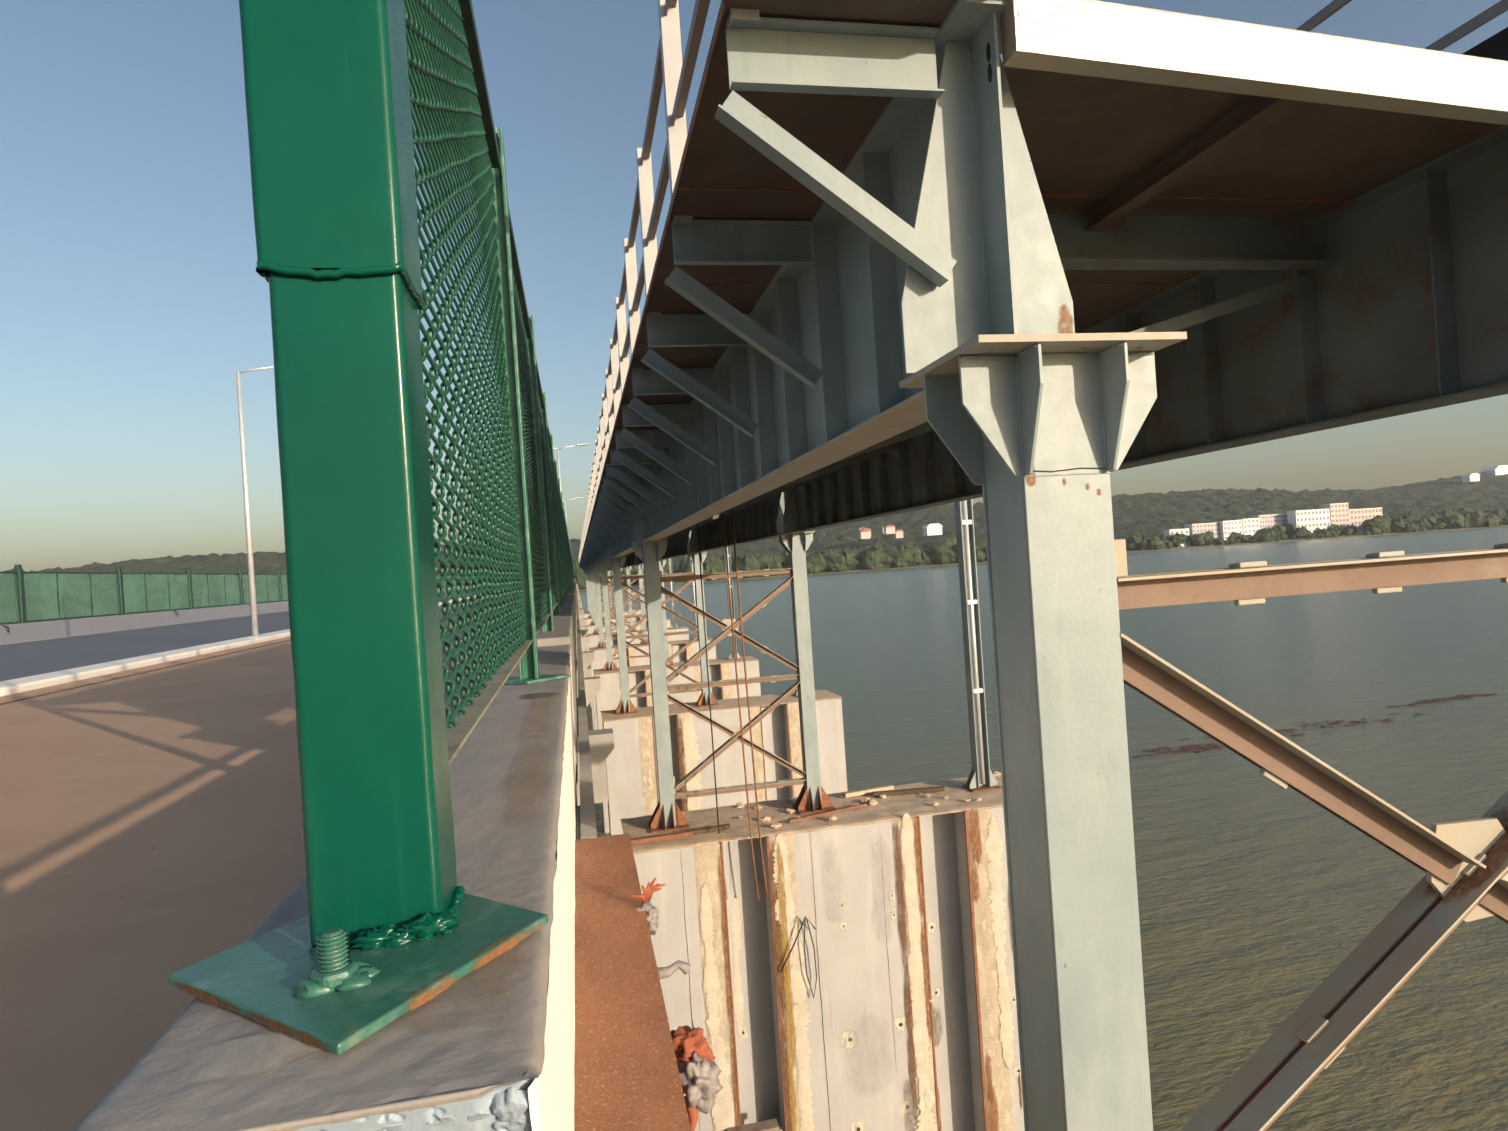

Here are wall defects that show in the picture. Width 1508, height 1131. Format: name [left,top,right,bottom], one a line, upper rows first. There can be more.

rust [1060,305,1073,333]
rust [970,809,982,902]
rust [1325,813,1508,1020]
rust [719,856,741,1126]
rust [893,820,932,1114]
spalling [426,1087,532,1131]
rust [987,1055,998,1131]
rust [1218,1041,1306,1131]